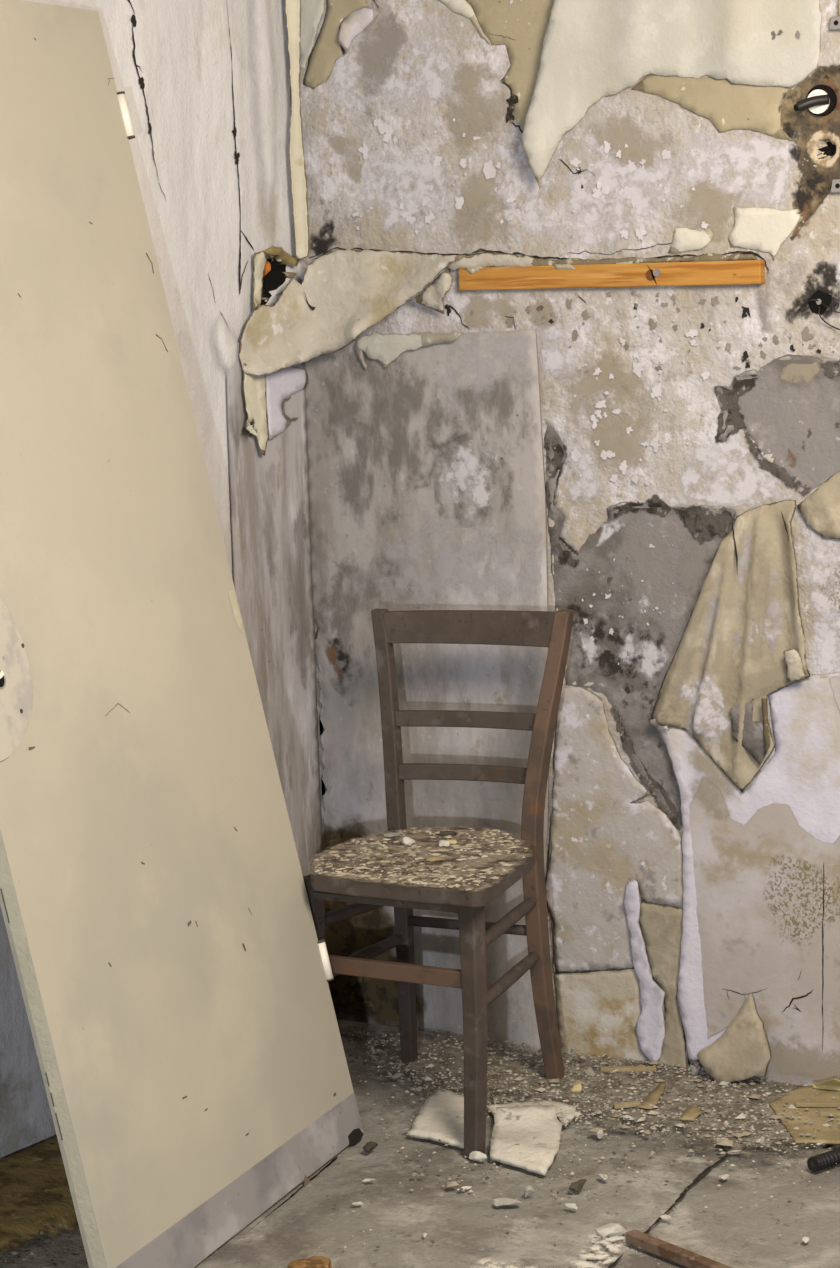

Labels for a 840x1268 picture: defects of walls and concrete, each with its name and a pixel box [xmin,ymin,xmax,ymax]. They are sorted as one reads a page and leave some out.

crack [128,0,166,198]
crack [226,1,254,293]
flaking render [303,0,369,89]
flaking render [439,0,553,129]
flaking render [446,65,840,274]
spalling [261,258,290,305]
spalling [566,298,591,348]
spalling [632,292,711,364]
water stain [430,436,467,474]
spalling [701,326,840,496]
spalling [544,364,735,831]
peeling [804,525,840,673]